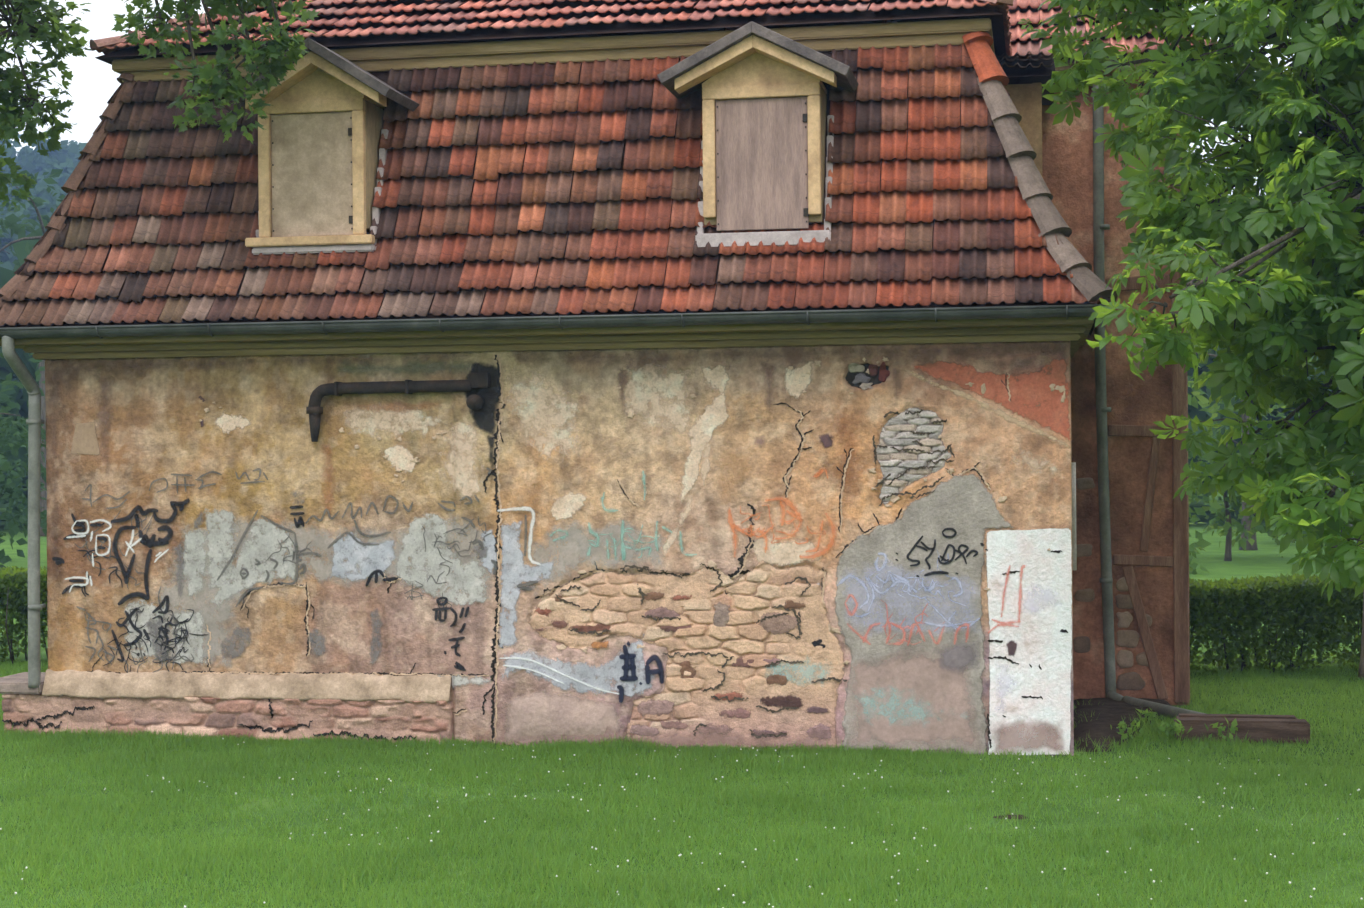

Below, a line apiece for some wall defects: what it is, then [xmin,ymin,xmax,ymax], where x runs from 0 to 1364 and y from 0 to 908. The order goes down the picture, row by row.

peeling [1049,384,1066,403]
crack [87,355,506,743]
crack [535,561,628,600]
crack [725,503,756,597]
crack [776,402,905,607]
spalling [868,408,955,507]
flaking render [528,537,849,749]